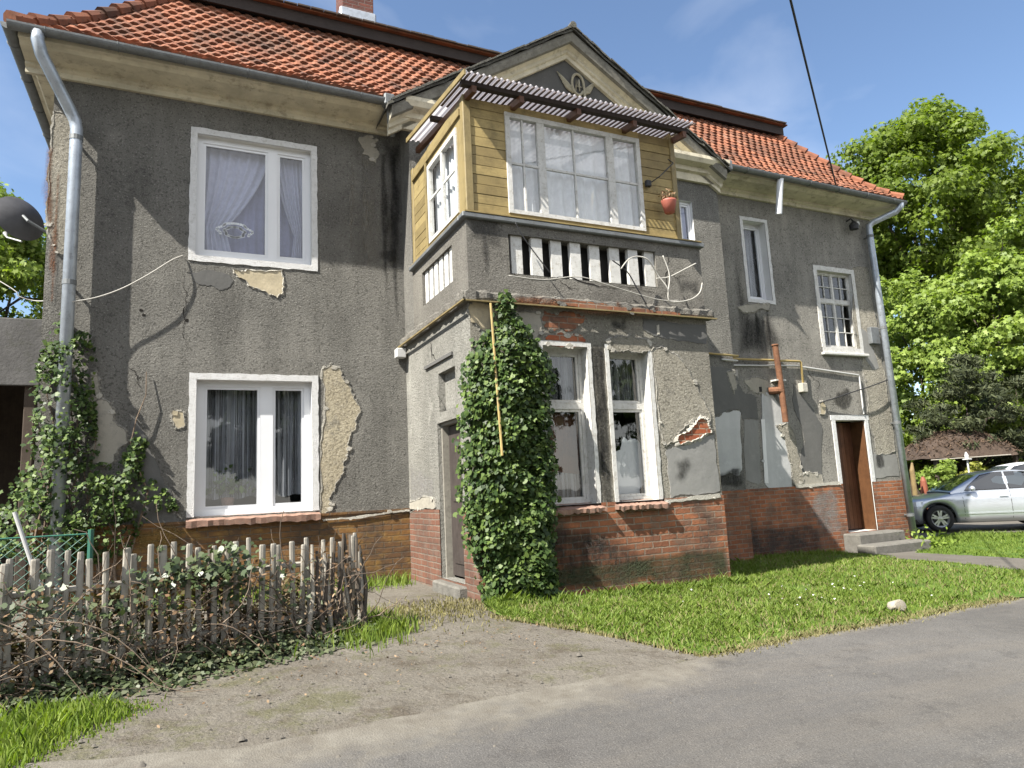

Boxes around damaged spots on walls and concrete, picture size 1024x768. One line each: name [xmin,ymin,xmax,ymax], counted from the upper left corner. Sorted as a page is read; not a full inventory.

peeling [358,135,380,163]
spalling [233,269,285,299]
leakage [740,302,776,349]
spalling [466,299,714,447]
spalling [726,369,778,396]
spalling [851,265,895,455]
spalling [169,409,187,431]
spalling [319,363,362,513]
spalling [761,419,824,488]
spalling [405,495,437,513]